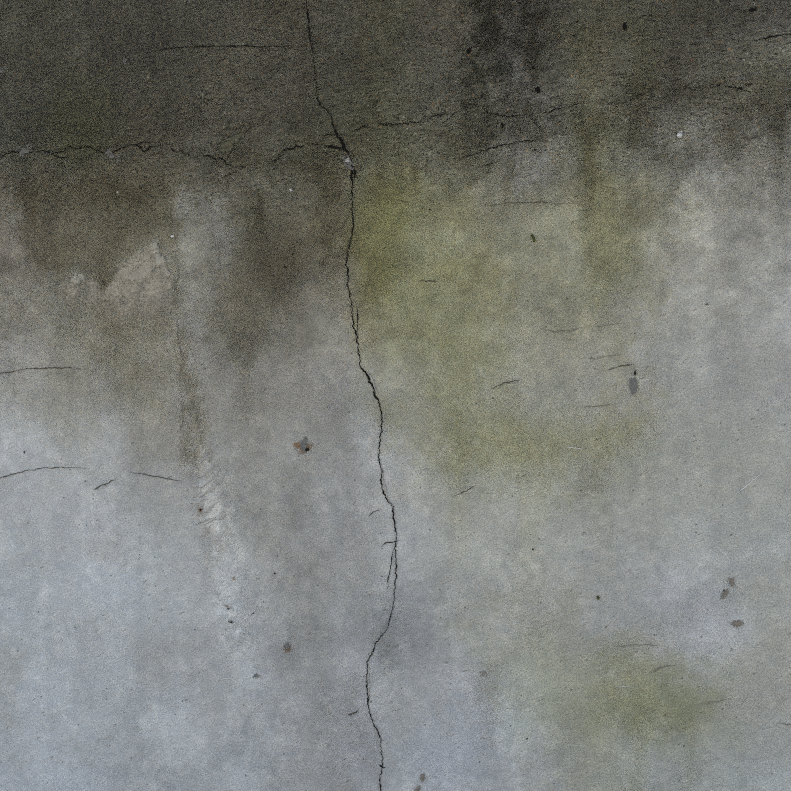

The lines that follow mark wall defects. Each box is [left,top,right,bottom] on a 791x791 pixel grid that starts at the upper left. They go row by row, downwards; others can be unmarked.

crack [0,142,242,182]
crack [453,139,541,169]
crack [161,1,454,791]
crack [0,467,88,478]